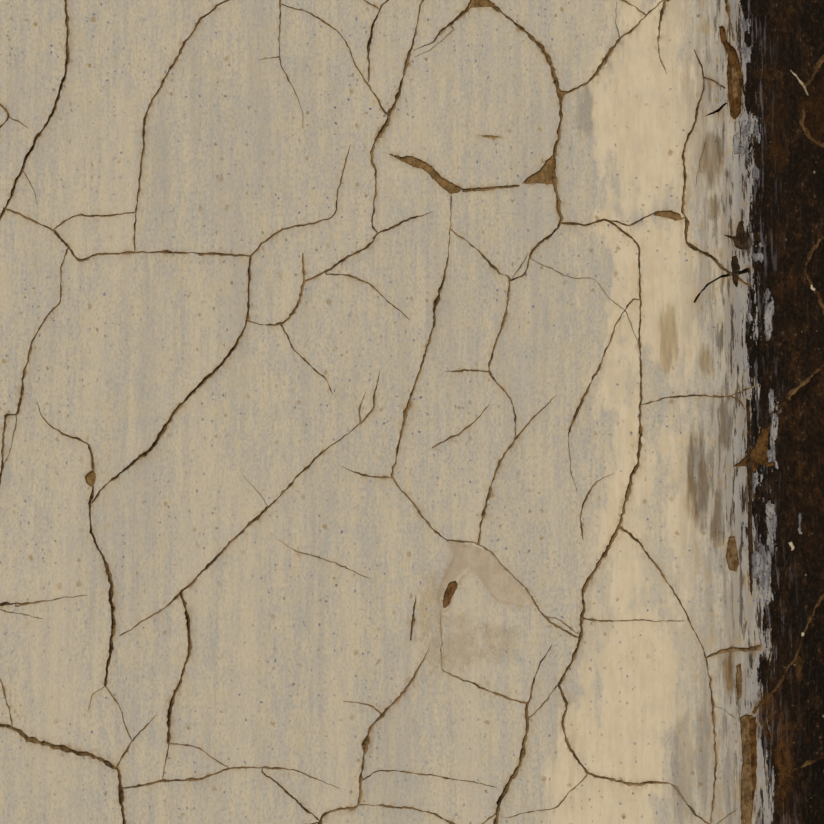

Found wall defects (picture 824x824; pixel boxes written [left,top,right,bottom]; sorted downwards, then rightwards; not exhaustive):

crack [493,6,559,88]
crack [566,0,670,94]
crack [725,0,735,41]
peeling [719,18,761,180]
spalling [388,153,554,194]
crack [681,49,753,303]
peeling [725,221,764,287]
peeling [748,288,774,341]
crack [0,0,497,824]
crack [341,96,761,824]
peeling [725,389,782,605]
peeling [740,714,757,824]